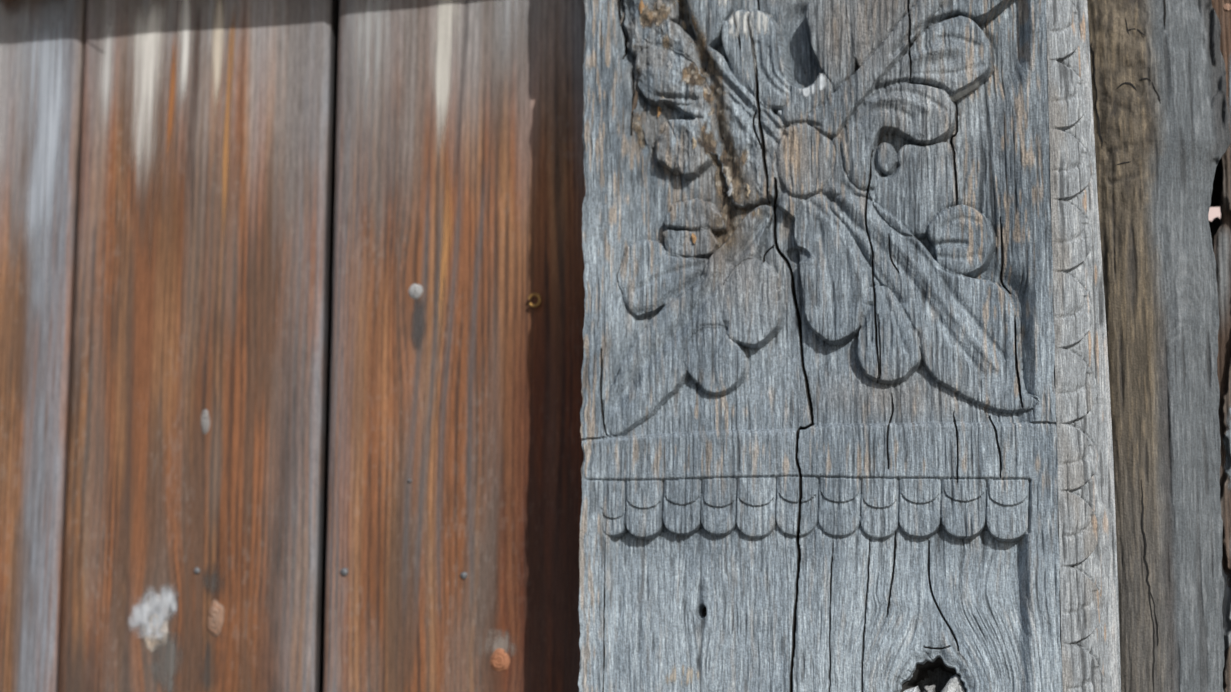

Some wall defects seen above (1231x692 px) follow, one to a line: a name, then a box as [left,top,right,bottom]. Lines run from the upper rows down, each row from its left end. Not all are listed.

crack [905,0,913,81]
crack [950,93,958,206]
crack [733,0,814,692]
crack [865,150,899,469]
crack [827,544,835,692]
crack [861,531,896,688]
crack [924,540,959,649]